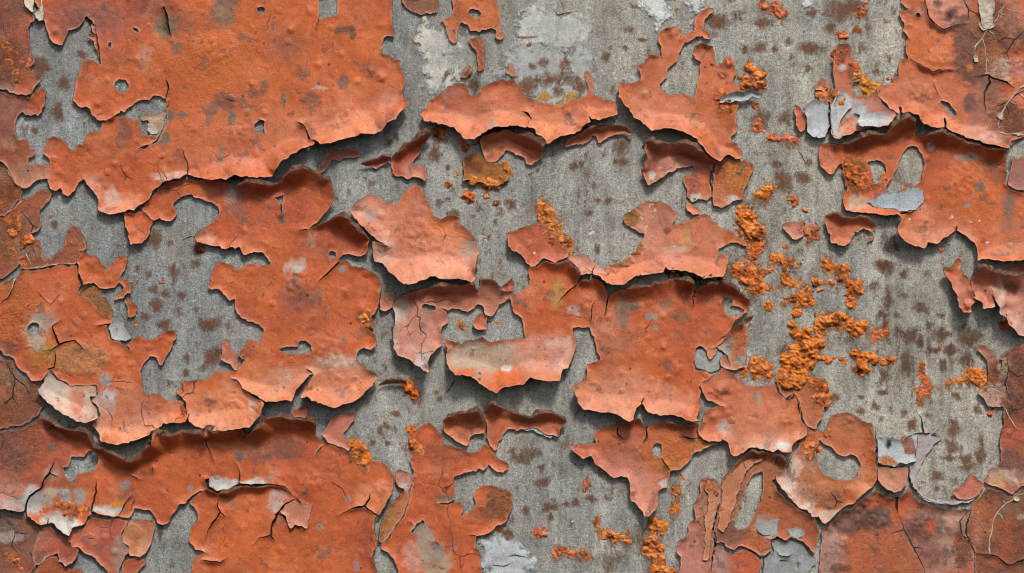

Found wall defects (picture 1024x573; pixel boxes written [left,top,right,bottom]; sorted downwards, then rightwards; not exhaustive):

corrosion [429,127,539,223]
peeling [402,0,762,208]
corrosion [737,0,896,148]
peeling [794,0,1024,273]
crack [926,0,1024,114]
crack [43,296,82,370]
peeling [0,0,409,573]
peeling [142,149,1024,573]
corrosion [726,159,988,430]
crack [205,469,300,540]
crack [330,481,378,516]
corrosion [592,474,686,573]